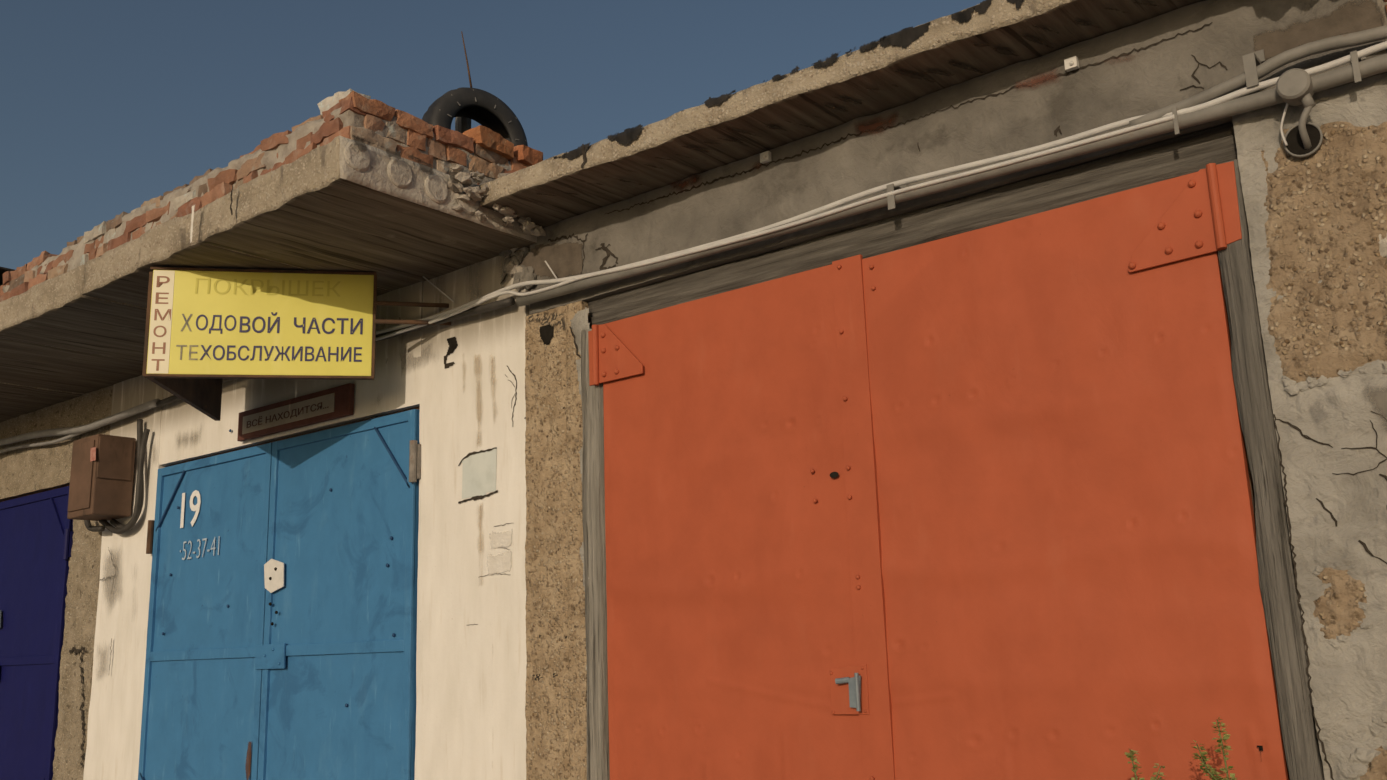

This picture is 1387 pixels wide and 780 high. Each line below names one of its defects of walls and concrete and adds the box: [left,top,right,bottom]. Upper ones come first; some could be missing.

crack [548,22,1228,270]
flaking render [1261,121,1387,395]
crack [1273,411,1387,780]
flaking render [1312,562,1373,650]
flaking render [1341,699,1387,780]